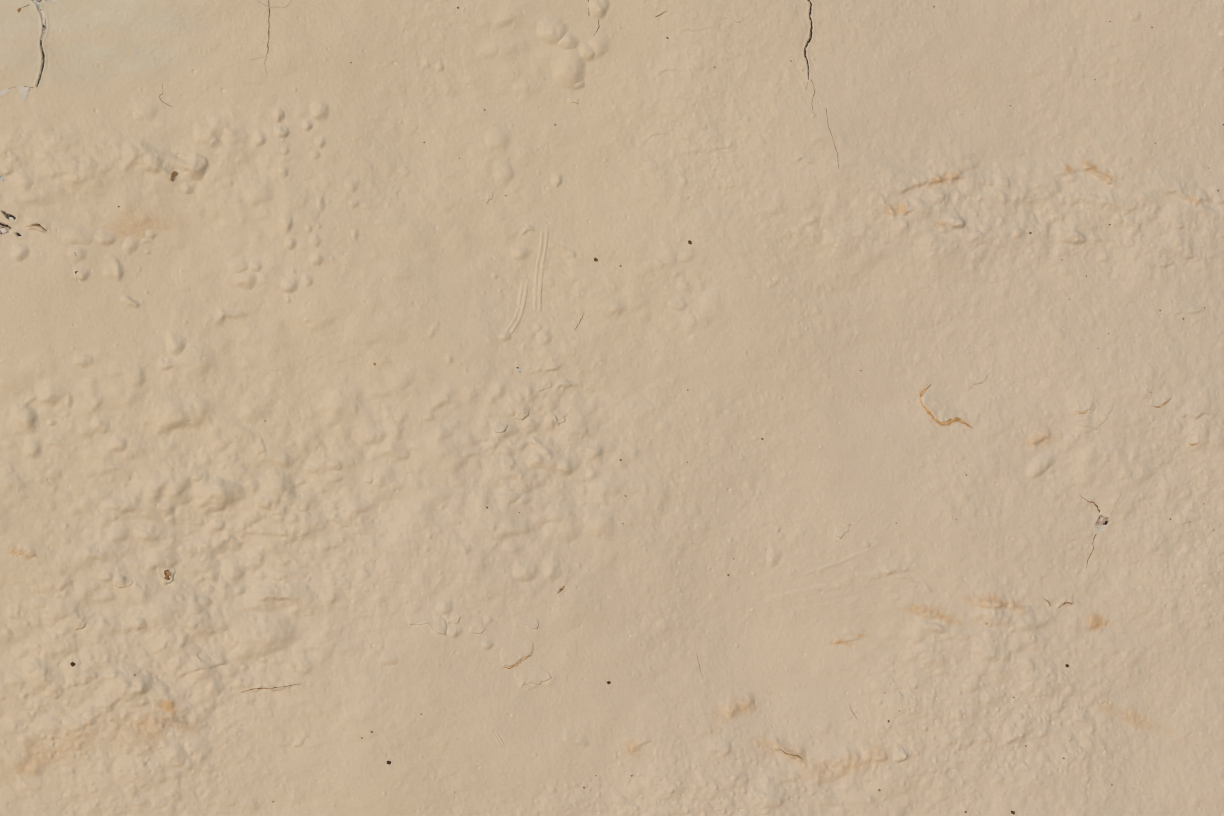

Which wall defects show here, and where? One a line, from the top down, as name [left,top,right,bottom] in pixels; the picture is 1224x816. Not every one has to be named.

crack [9,2,46,89]
crack [804,0,839,169]
spalling [0,211,21,236]
peeling [920,384,972,428]
crack [1081,496,1121,568]